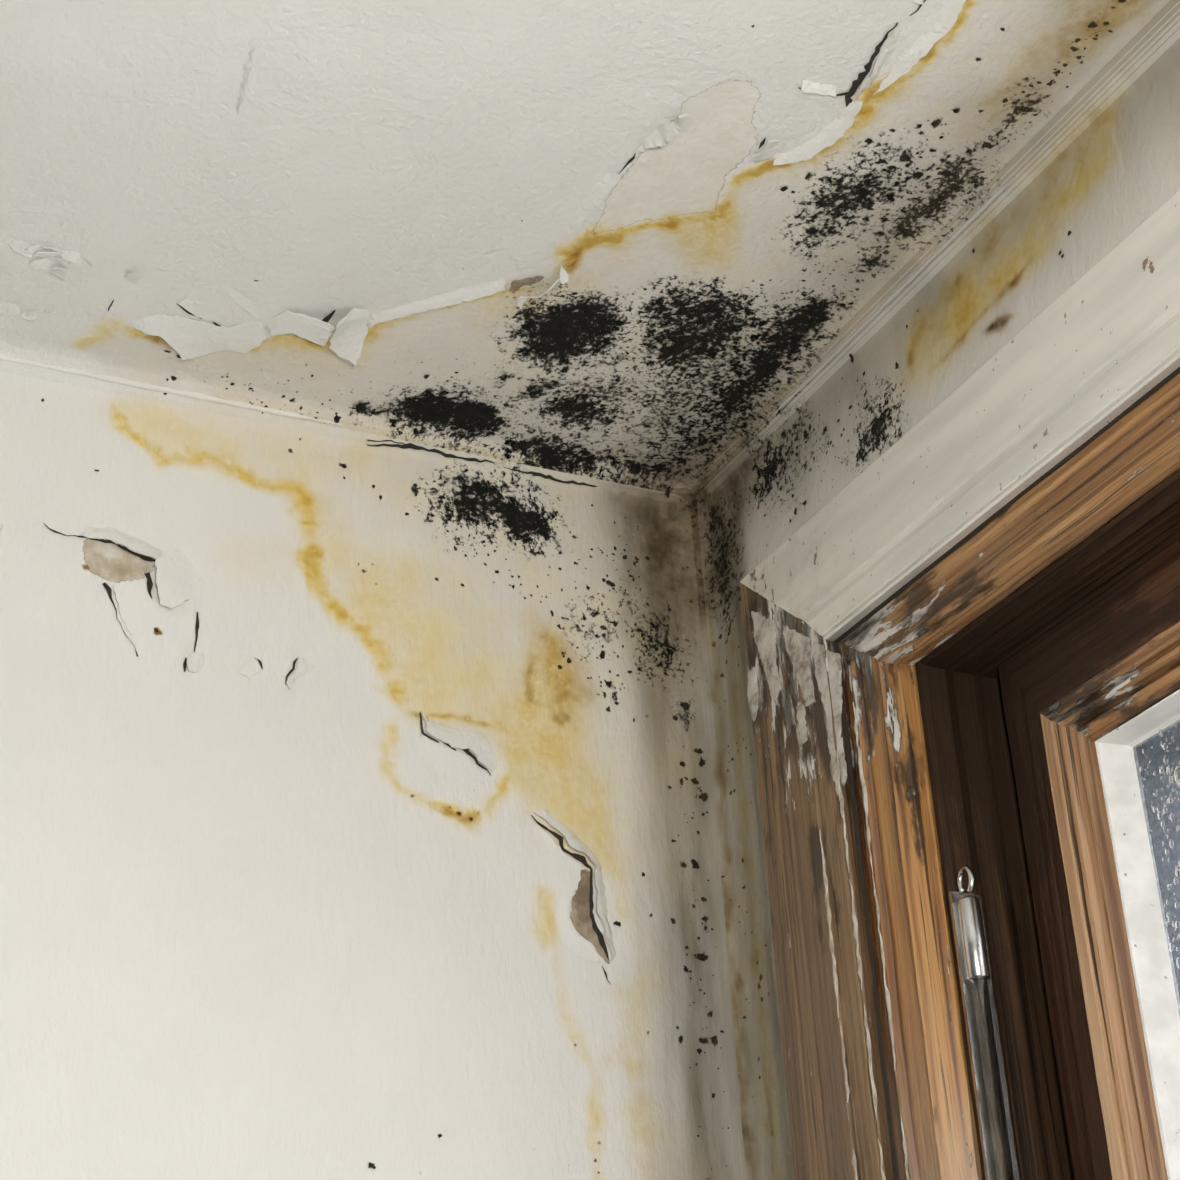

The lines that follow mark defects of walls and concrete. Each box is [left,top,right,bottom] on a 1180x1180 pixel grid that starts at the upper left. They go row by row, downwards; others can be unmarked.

peeling [568,0,966,234]
crack [799,0,926,107]
peeling [130,264,569,366]
water stain [248,17,1112,712]
spalling [44,523,205,673]
crack [419,712,497,785]
water stain [673,701,693,731]
water stain [668,746,708,834]
peeling [529,808,616,984]
water stain [679,894,724,1069]